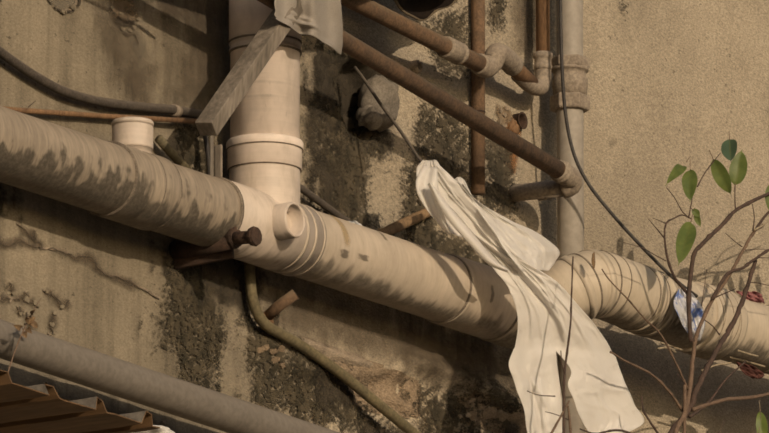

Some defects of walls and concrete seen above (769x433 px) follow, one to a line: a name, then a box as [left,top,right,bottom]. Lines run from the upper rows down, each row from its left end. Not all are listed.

crack [0,222,160,299]
water stain [139,247,402,433]
water stain [273,299,524,433]